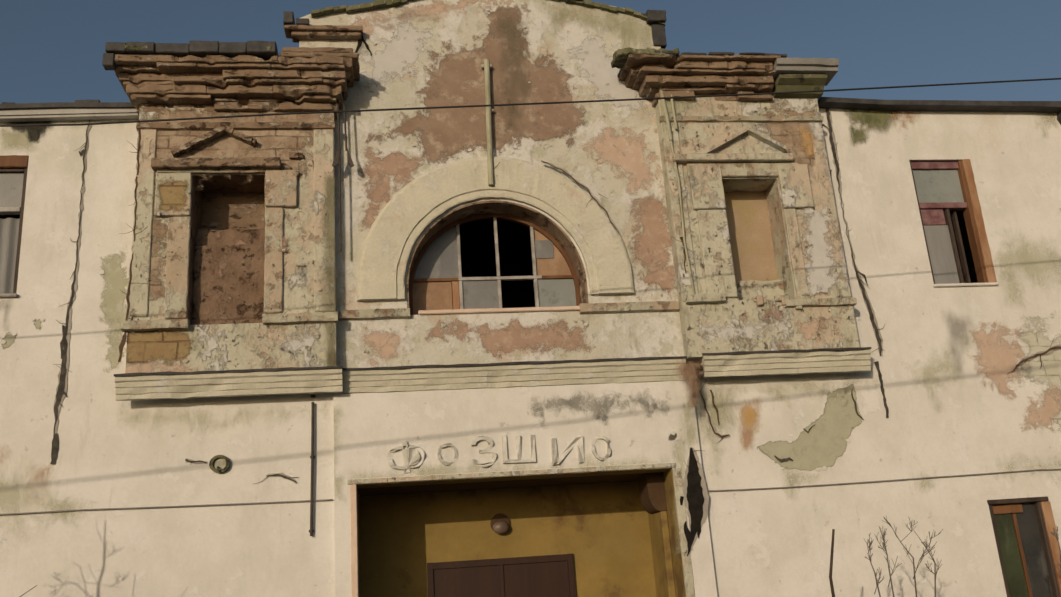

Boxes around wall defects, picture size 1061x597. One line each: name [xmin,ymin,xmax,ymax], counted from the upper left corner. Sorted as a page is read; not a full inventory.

crack [50,120,92,464]
crack [118,122,143,362]
flaking render [99,253,198,373]
flaking render [364,327,399,366]
flaking render [426,319,590,358]
flaking render [352,0,676,297]
crack [541,160,619,234]
crack [680,380,731,557]
flaking render [757,384,864,471]
crack [822,108,889,418]
flaking render [973,316,1061,430]
crack [1009,342,1061,373]